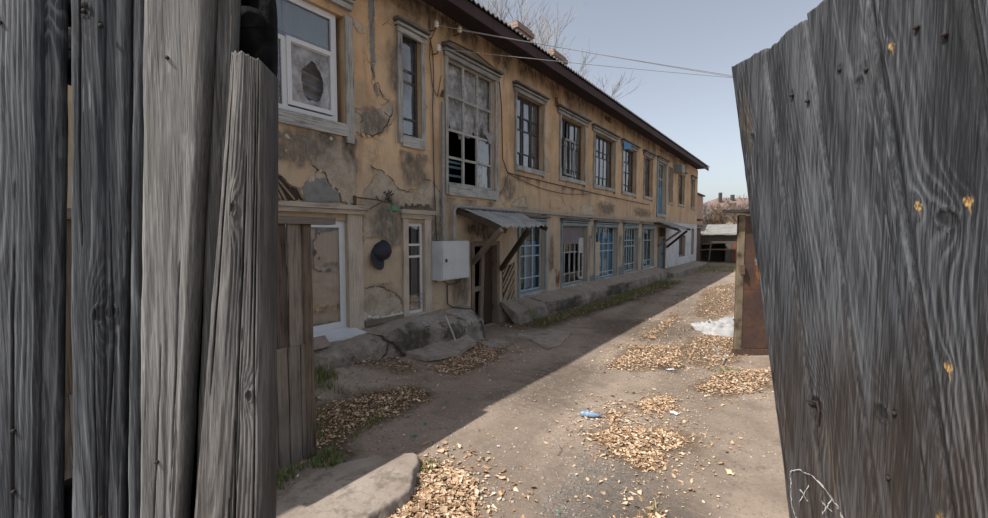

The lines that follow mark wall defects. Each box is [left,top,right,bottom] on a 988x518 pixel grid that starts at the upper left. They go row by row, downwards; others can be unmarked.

flaking render [278,0,442,246]
flaking render [364,285,404,321]